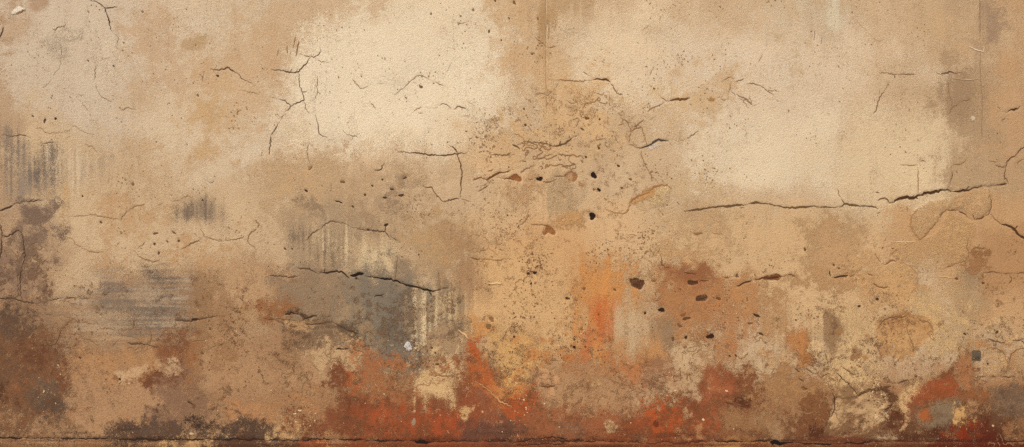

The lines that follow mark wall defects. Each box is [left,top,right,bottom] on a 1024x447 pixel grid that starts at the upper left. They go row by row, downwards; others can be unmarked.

crack [202,49,358,161]
crack [0,66,916,435]
corrosion [109,243,835,447]
crack [687,147,1024,356]
corrosion [854,344,1024,447]